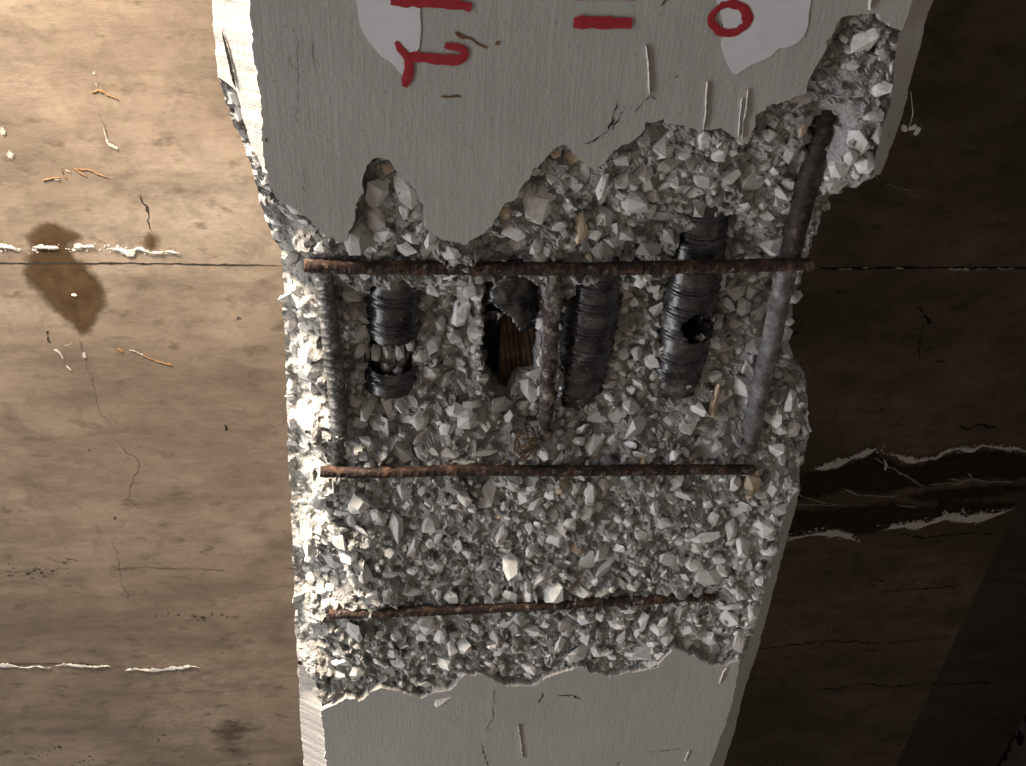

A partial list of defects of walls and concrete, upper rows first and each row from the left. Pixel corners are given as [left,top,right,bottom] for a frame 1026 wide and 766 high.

peeling [356,0,421,74]
peeling [718,0,811,74]
damp [0,223,178,333]
spalling [218,13,921,707]